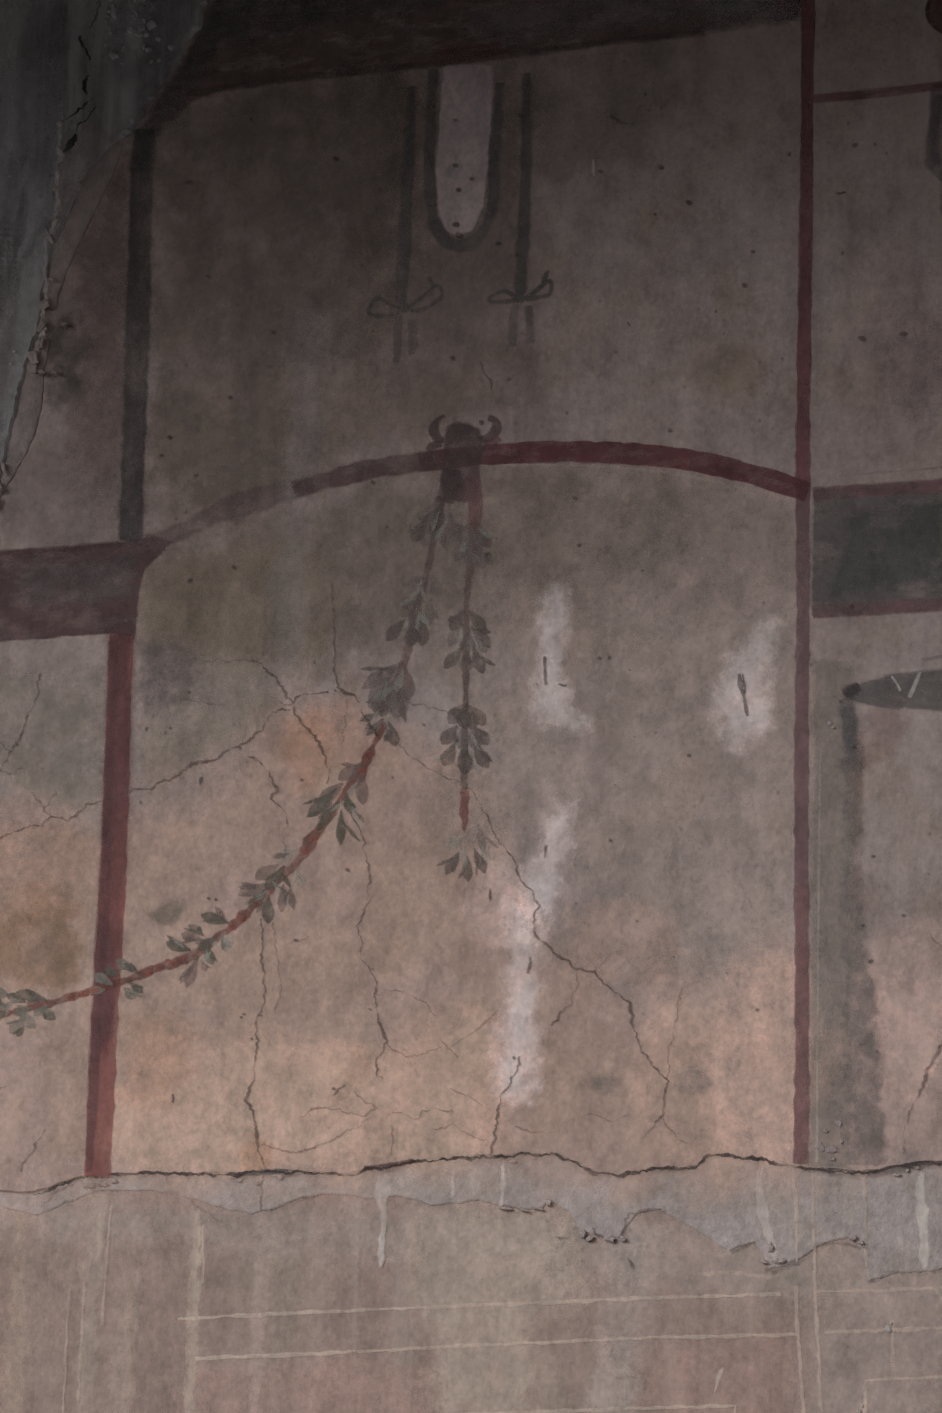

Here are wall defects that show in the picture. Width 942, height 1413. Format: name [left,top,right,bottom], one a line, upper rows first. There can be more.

crack [0,584,942,1221]
leakage [0,496,942,1413]
crack [556,1208,666,1268]
crack [730,1241,940,1282]